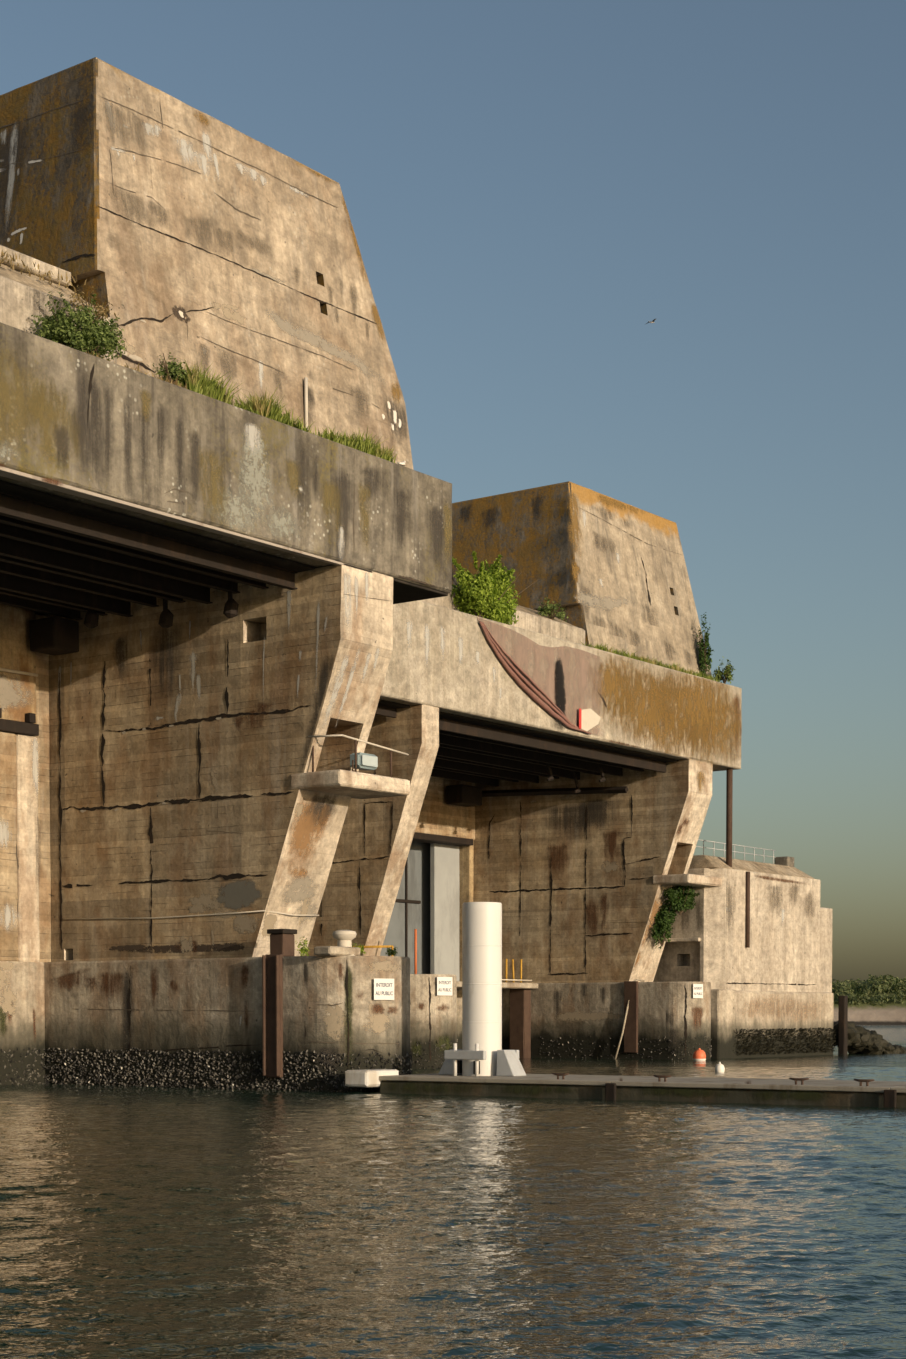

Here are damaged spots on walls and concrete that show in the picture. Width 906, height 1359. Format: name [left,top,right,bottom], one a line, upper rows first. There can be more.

crack [0,95,376,324]
crack [88,307,379,418]
water stain [57,381,223,510]
water stain [246,425,259,451]
water stain [382,402,406,437]
water stain [299,451,378,551]
water stain [397,492,405,543]
water stain [432,506,471,554]
crack [58,639,310,1082]
crack [488,795,658,975]
corrosion [58,972,122,995]
corrosion [151,971,178,999]